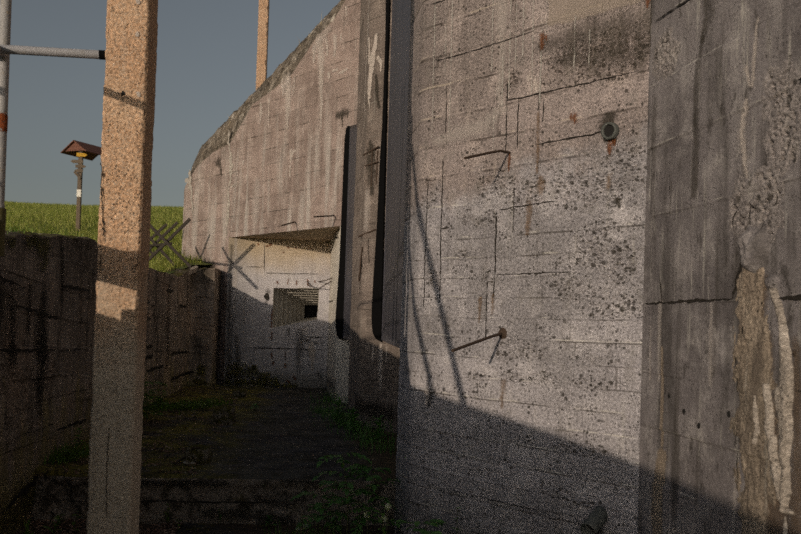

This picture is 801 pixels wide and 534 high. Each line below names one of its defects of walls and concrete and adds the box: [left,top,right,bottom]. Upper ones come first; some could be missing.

crack [645,260,742,304]
crack [756,294,801,313]
rust [451,332,503,352]
peeling [729,267,796,534]